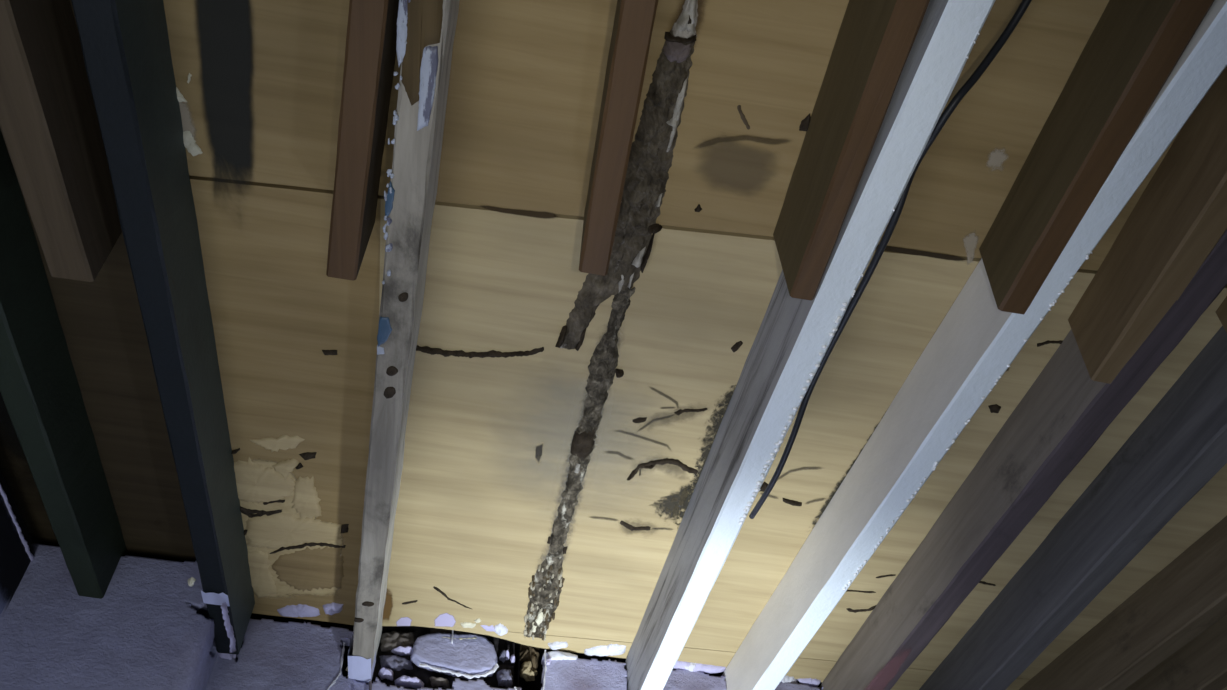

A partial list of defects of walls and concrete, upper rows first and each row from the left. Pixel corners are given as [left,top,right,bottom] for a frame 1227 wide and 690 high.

water stain [535,394,585,459]
water stain [593,430,607,450]
water stain [652,385,736,525]
peeling [231,435,349,617]
spalling [372,618,626,690]